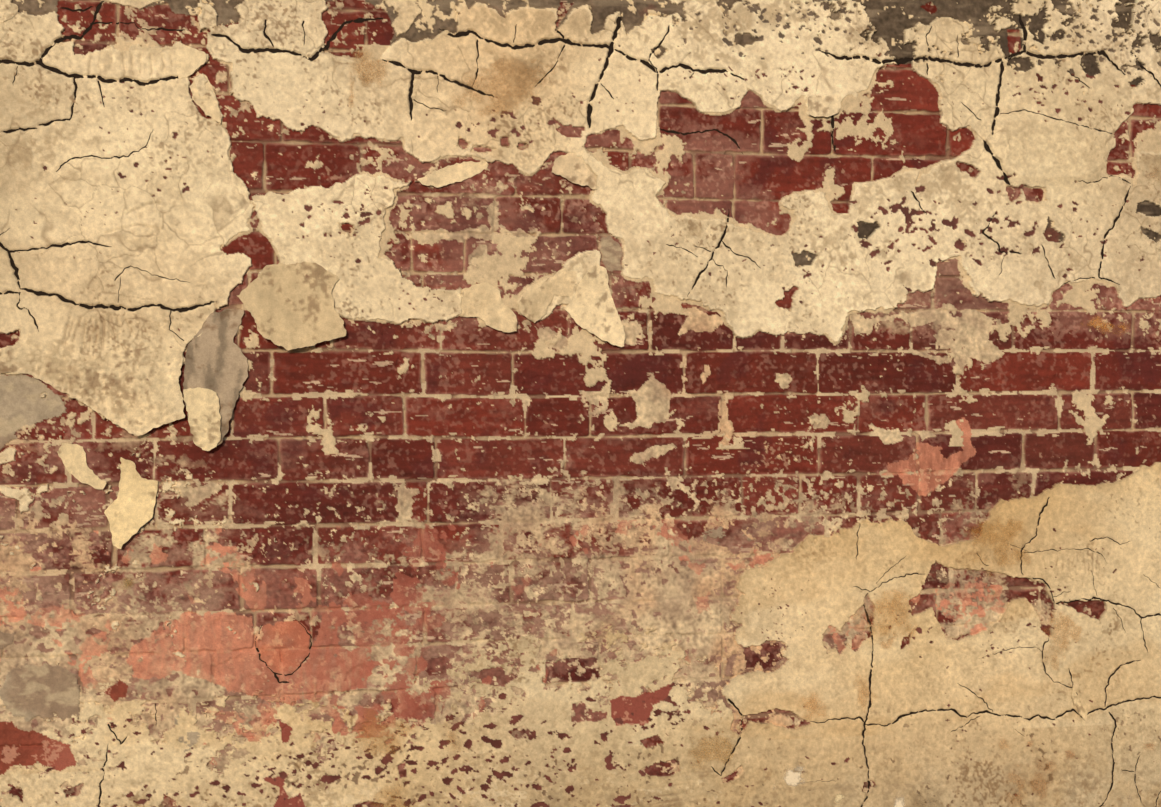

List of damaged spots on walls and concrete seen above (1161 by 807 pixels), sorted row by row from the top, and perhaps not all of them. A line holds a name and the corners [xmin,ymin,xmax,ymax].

crack [0,1,383,133]
crack [382,16,744,128]
crack [815,15,1161,185]
peeling [0,0,1161,451]
crack [982,175,1131,285]
crack [0,232,217,341]
peeling [58,443,158,549]
peeling [105,610,386,740]
spalling [728,638,790,675]
crack [811,497,1161,807]
spalling [908,561,1107,647]
peeling [0,722,78,776]